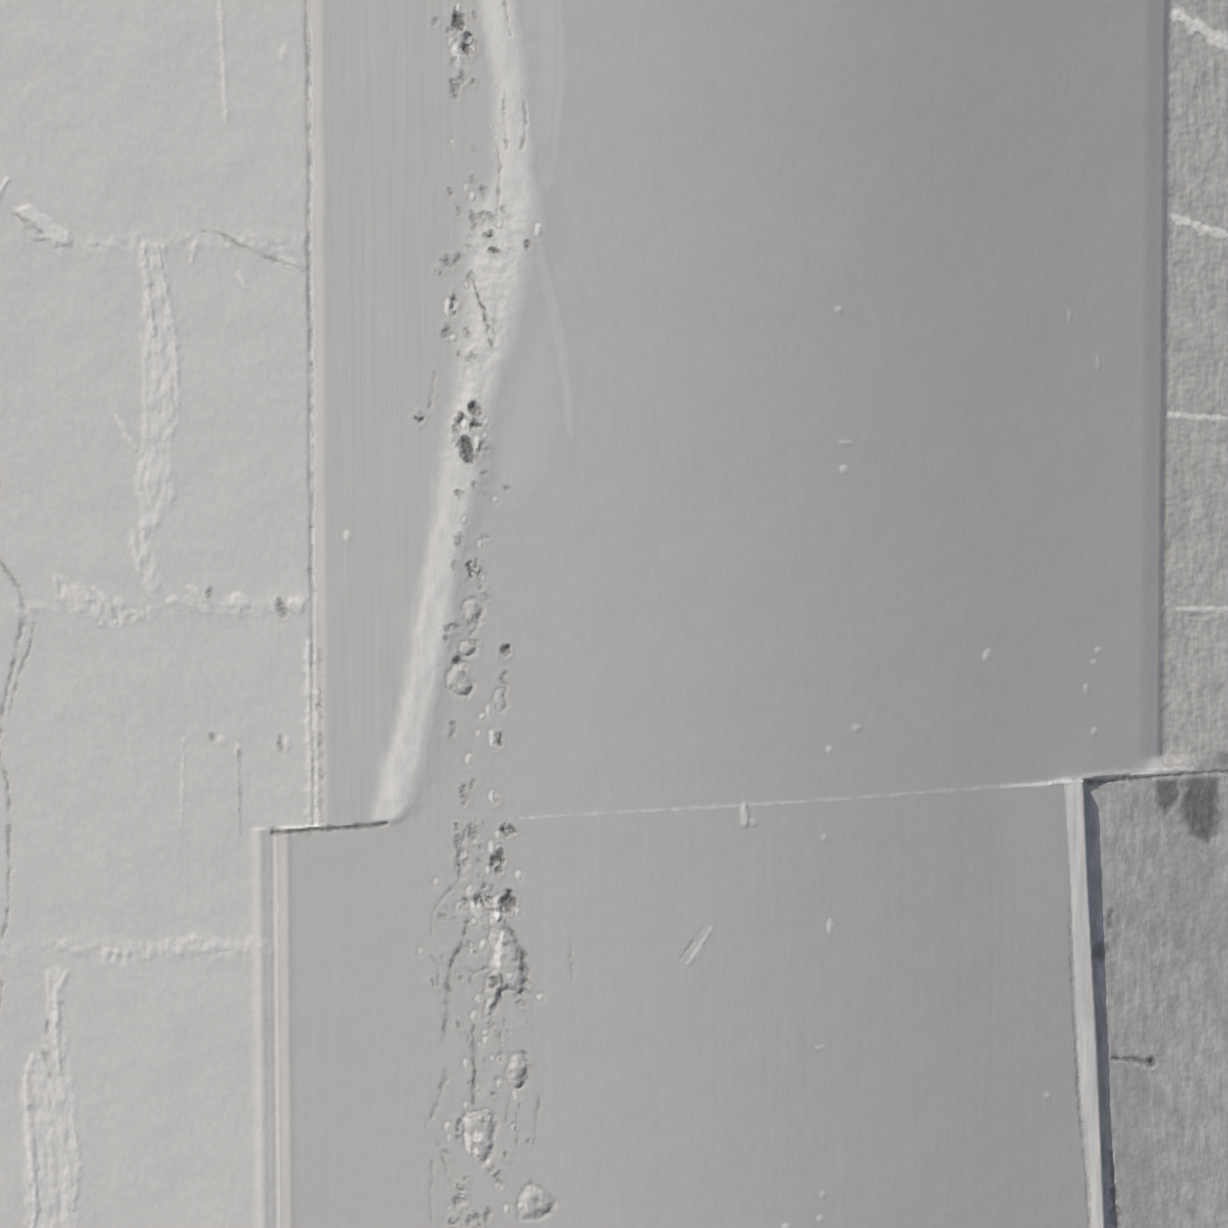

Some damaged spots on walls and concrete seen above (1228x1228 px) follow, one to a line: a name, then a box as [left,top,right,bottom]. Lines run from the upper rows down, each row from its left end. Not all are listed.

spalling [430,3,478,102]
spalling [434,174,505,364]
spalling [523,221,544,253]
spalling [451,399,513,503]
crack [0,553,38,940]
spalling [442,515,493,700]
spalling [475,643,513,749]
spalling [417,719,559,1228]
leakage [1136,770,1228,1055]